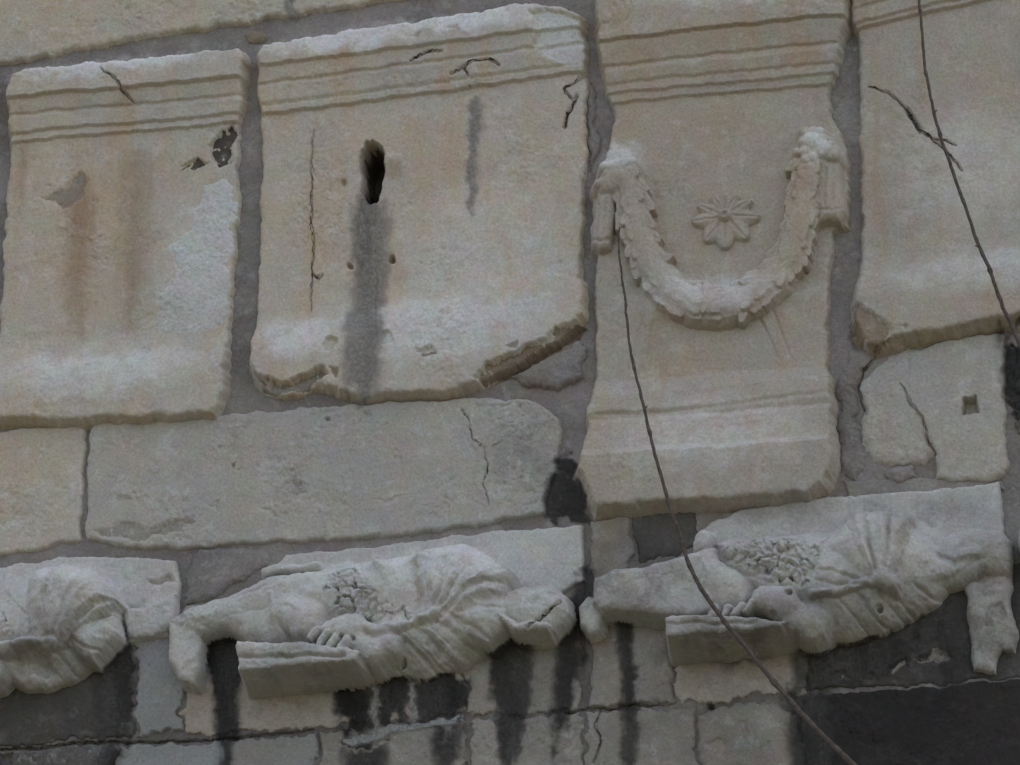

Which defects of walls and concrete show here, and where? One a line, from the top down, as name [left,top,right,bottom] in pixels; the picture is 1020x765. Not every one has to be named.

crack [454,57,498,74]
crack [563,75,583,128]
crack [869,86,959,168]
spalling [146,126,242,333]
crack [309,132,320,311]
damp [345,195,386,407]
crack [858,341,888,413]
damp [206,637,241,765]
damp [333,673,468,765]
damp [487,637,533,765]
damp [551,566,593,729]
damp [616,621,638,765]